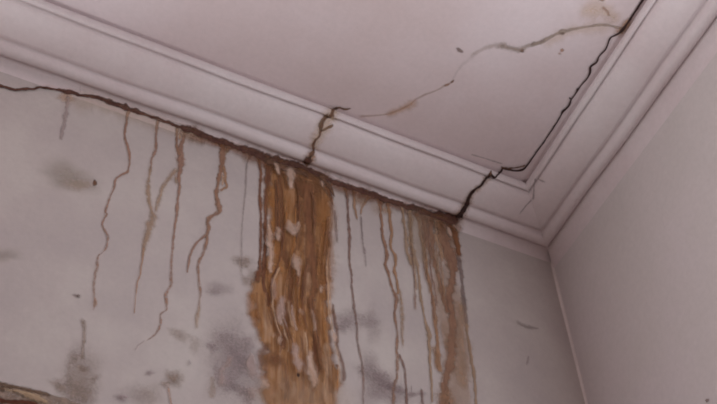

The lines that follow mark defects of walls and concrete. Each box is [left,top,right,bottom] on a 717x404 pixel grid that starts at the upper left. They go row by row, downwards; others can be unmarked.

crack [0,0,644,229]